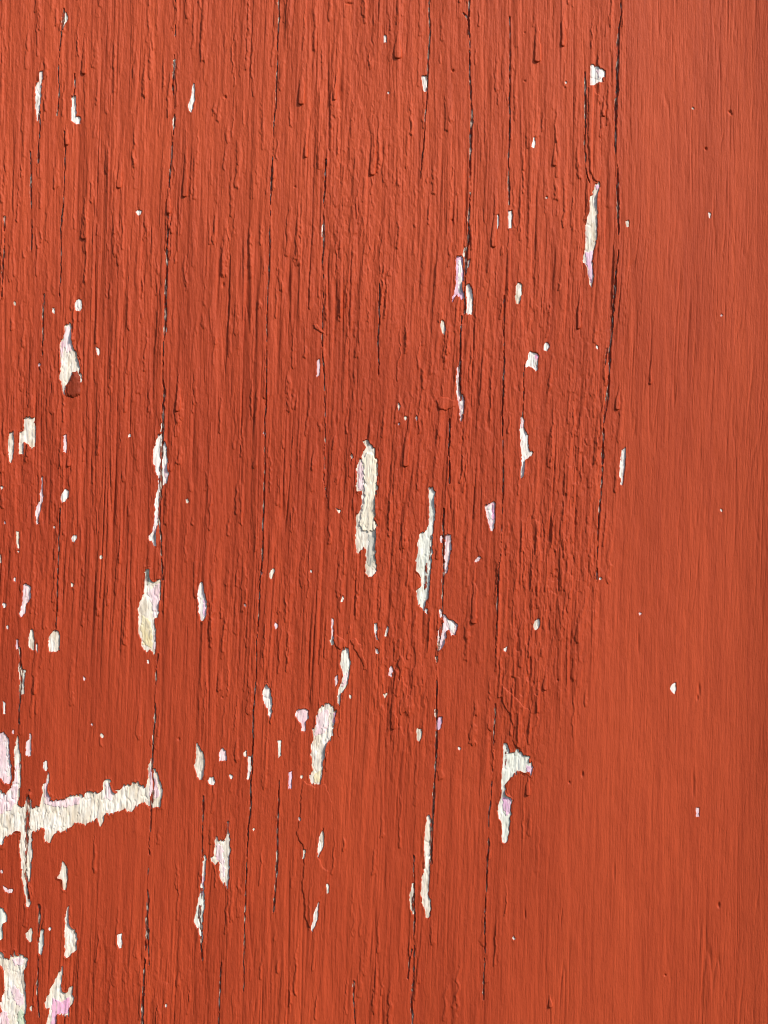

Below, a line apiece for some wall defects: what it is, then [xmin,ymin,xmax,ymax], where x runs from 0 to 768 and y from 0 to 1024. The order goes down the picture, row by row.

crack [448,0,473,484]
crack [596,2,621,580]
peeling [138,567,161,664]
peeling [350,440,379,577]
peeling [413,487,481,659]
peeling [0,908,51,1024]
peeling [45,906,77,1024]
peeling [0,730,163,907]
crack [141,654,159,1024]
peeling [194,821,231,940]
peeling [288,619,388,931]
crack [407,508,446,1024]